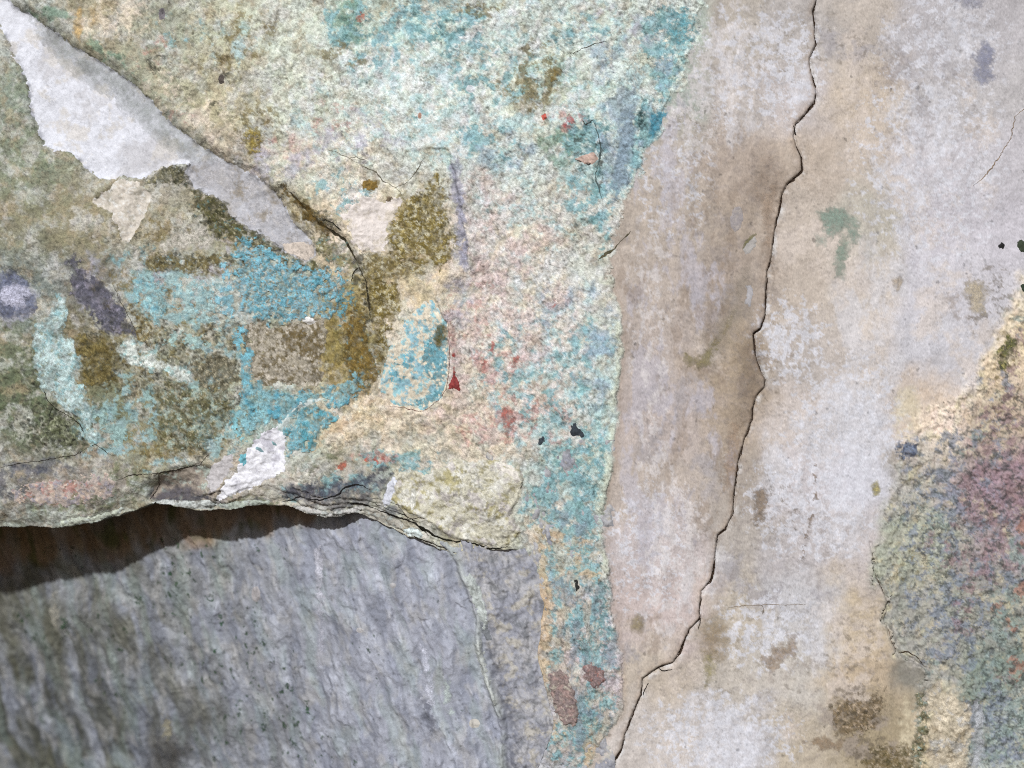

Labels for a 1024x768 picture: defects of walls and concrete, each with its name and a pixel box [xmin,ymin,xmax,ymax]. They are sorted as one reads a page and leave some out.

crack [973,109,1024,186]
spalling [0,0,363,509]
crack [289,192,372,321]
crack [599,232,630,259]
crack [615,0,817,760]
spalling [11,472,125,527]
spalling [292,458,524,548]
peeling [463,573,497,706]